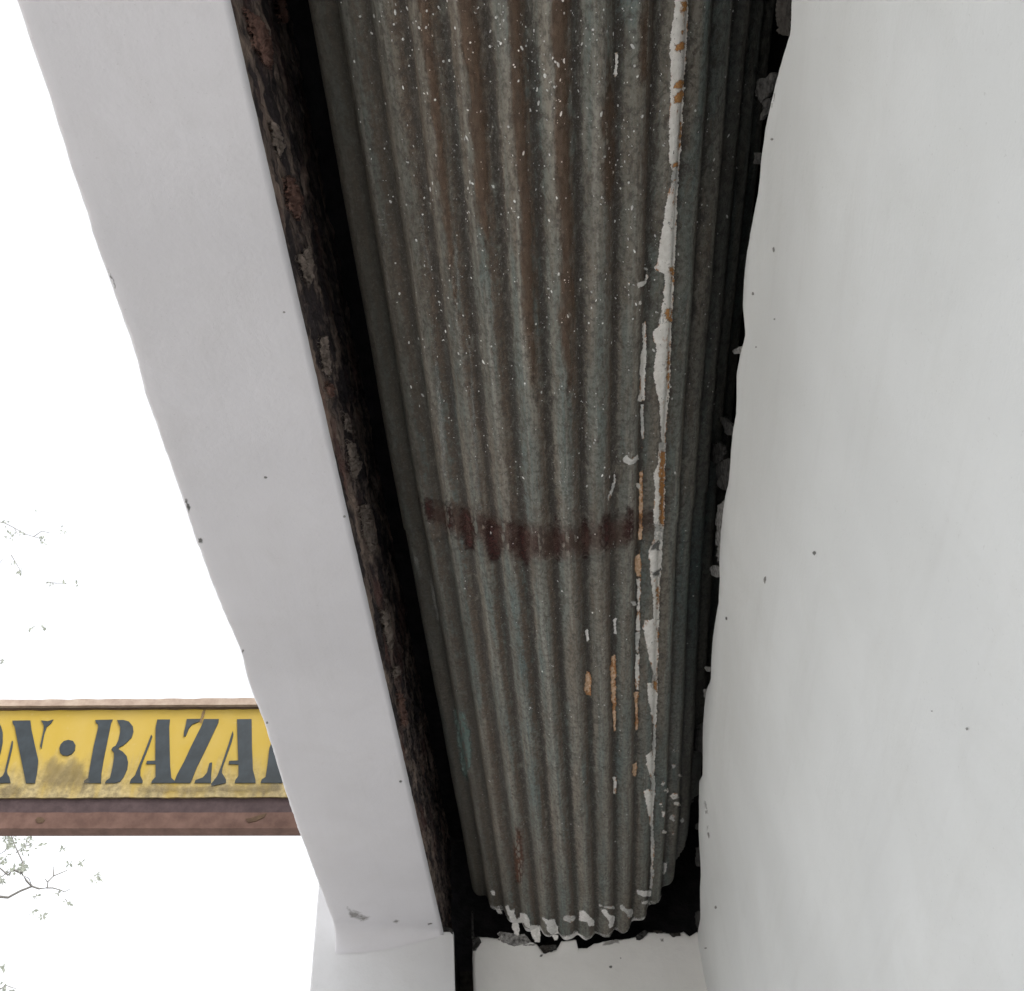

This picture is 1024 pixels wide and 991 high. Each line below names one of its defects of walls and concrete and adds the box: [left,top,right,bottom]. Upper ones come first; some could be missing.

spalling [241,0,289,70]
spalling [295,246,315,286]
corrosion [418,0,456,297]
corrosion [459,0,489,248]
corrosion [508,0,536,383]
corrosion [551,0,574,392]
corrosion [602,59,614,203]
spalling [317,336,332,380]
spalling [340,411,363,482]
peeling [623,0,699,890]
flaking render [497,931,557,957]
flaking render [635,930,681,941]